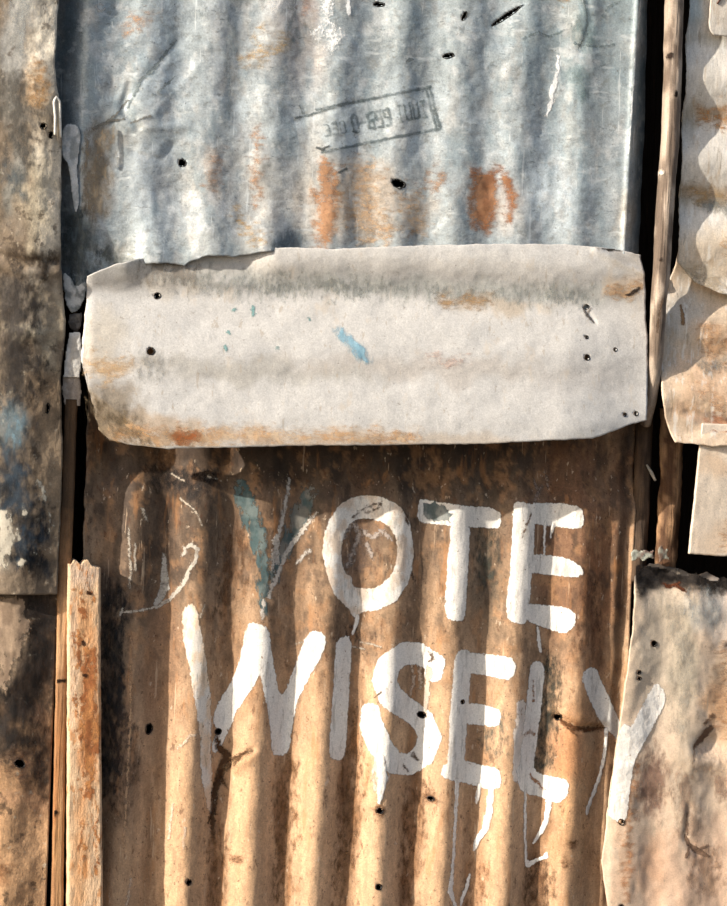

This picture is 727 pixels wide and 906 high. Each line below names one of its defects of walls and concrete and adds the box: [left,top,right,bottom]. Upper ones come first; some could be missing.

corrosion [312,157,393,249]
corrosion [468,166,518,233]
water stain [0,127,117,575]
corrosion [108,424,382,447]